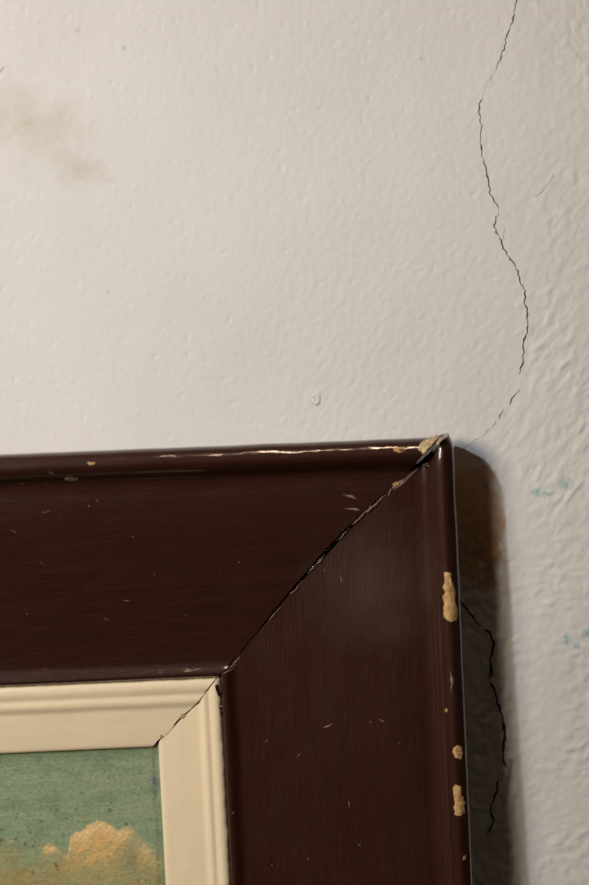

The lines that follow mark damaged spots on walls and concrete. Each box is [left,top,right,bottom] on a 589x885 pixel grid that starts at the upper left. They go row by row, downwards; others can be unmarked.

crack [496,0,517,69]
crack [478,98,528,419]
crack [461,601,509,835]